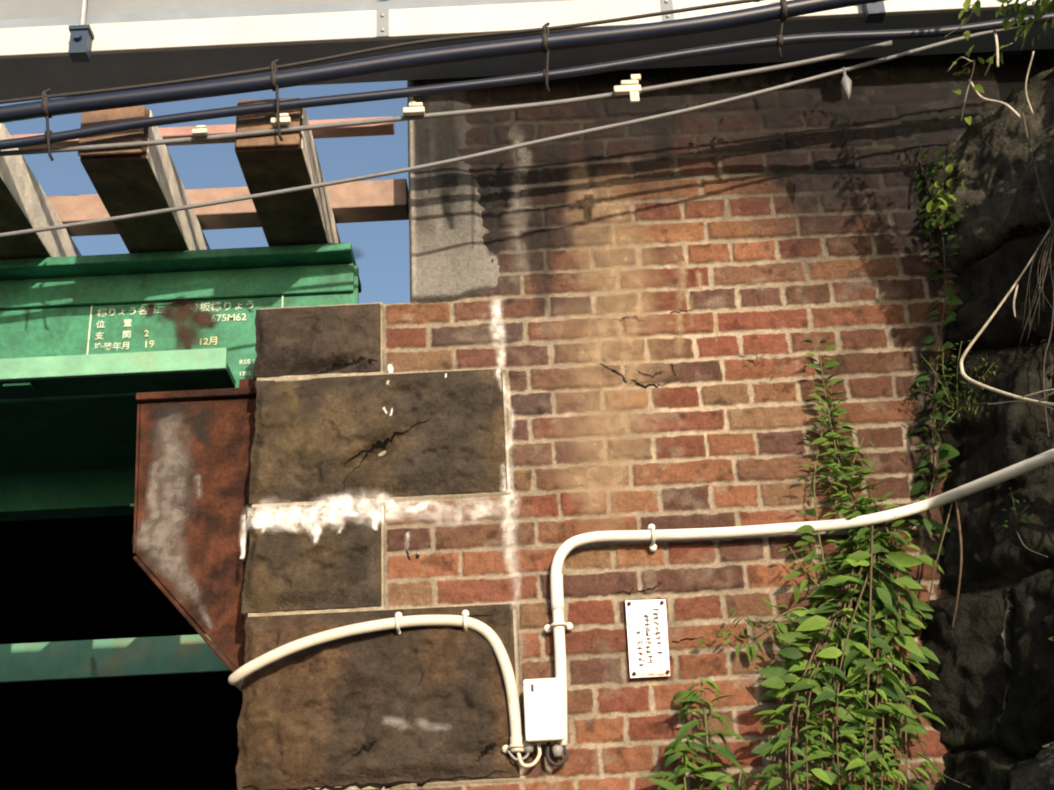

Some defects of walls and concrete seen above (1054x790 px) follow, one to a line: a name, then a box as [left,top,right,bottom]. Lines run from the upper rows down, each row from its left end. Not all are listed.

rust [147,300,215,350]
damp [493,304,503,337]
crack [600,363,676,388]
crack [343,418,431,492]
damp [241,495,431,558]